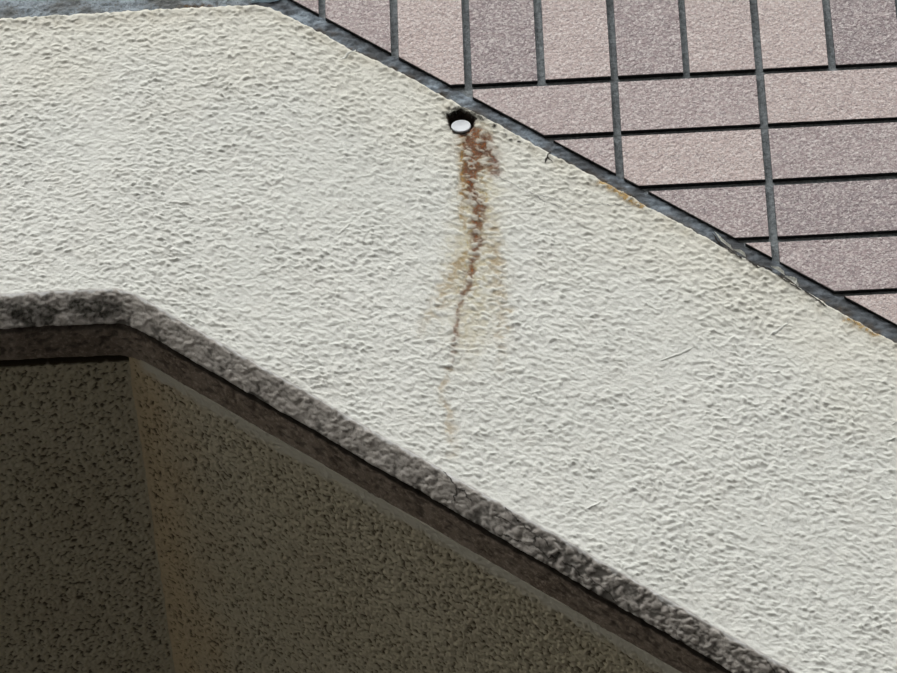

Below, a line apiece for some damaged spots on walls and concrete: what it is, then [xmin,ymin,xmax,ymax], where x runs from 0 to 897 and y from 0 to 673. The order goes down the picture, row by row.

rust [457,128,499,310]
crack [492,174,640,208]
crack [444,472,472,505]
crack [496,507,616,602]